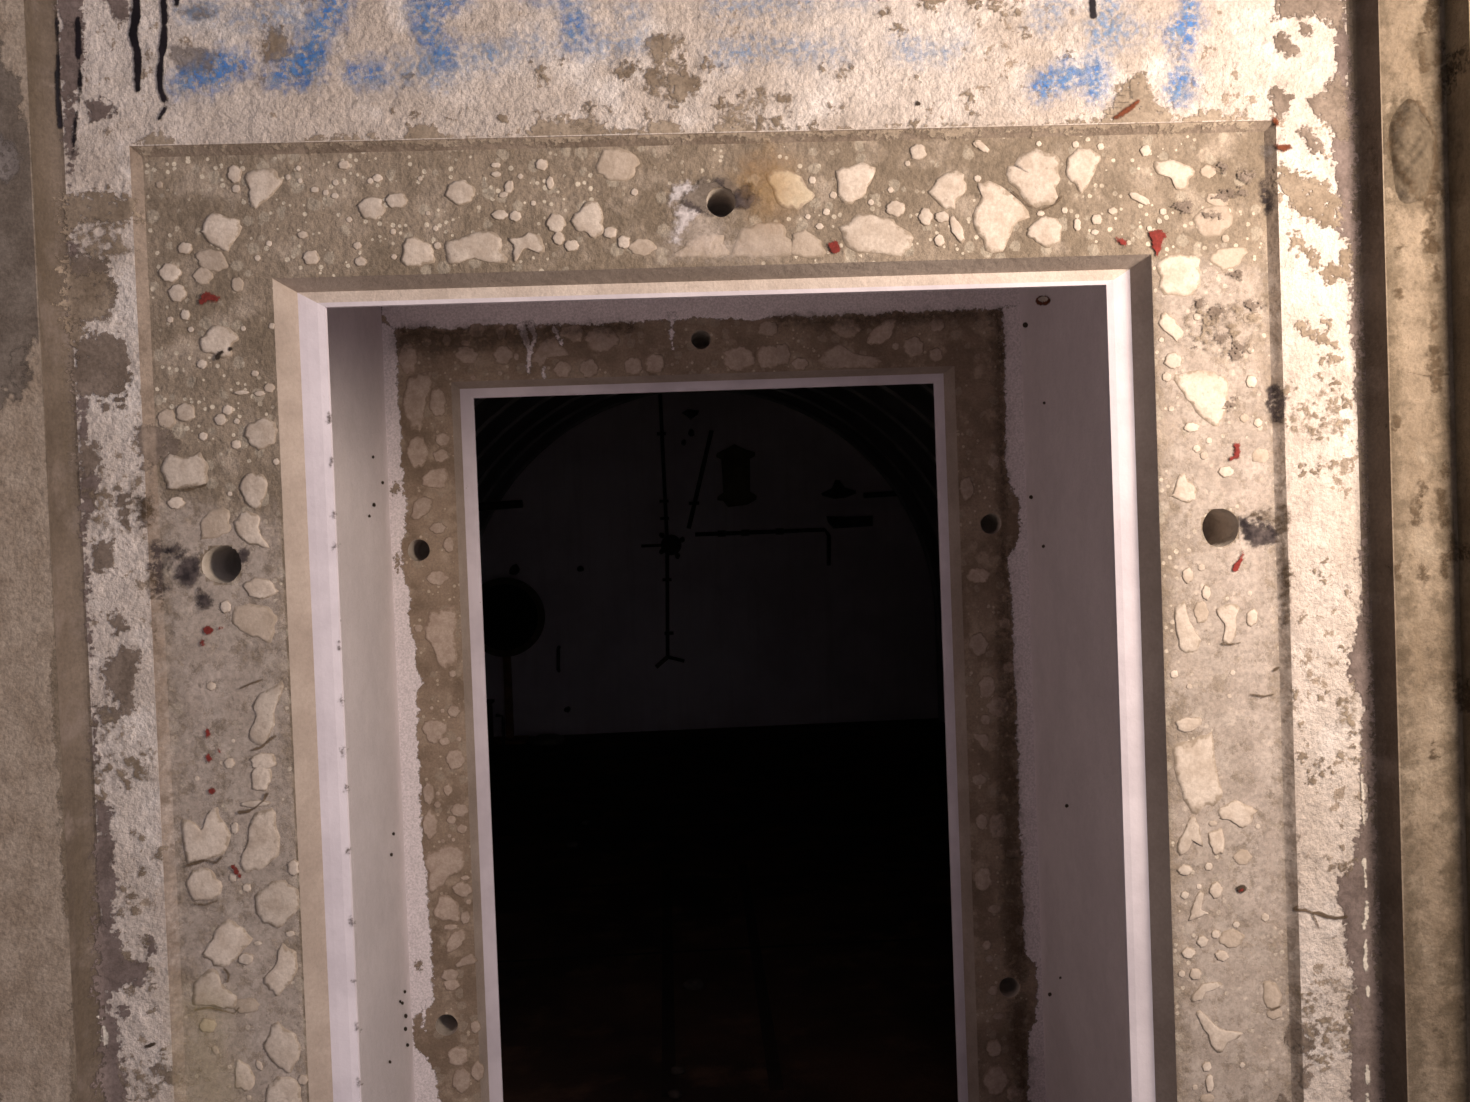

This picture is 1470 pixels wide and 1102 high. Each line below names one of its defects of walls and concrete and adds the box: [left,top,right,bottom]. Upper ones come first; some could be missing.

peeling [878,0,909,35]
peeling [917,0,1032,40]
spalling [133,25,1269,460]
damp [1387,246,1404,299]
damp [1390,382,1401,439]
spalling [1168,473,1196,503]
spalling [1217,466,1234,478]
spalling [47,0,309,1102]
peeling [1262,0,1386,1102]
spalling [1174,564,1258,654]
spalling [1172,717,1261,1102]
crack [1293,905,1348,927]